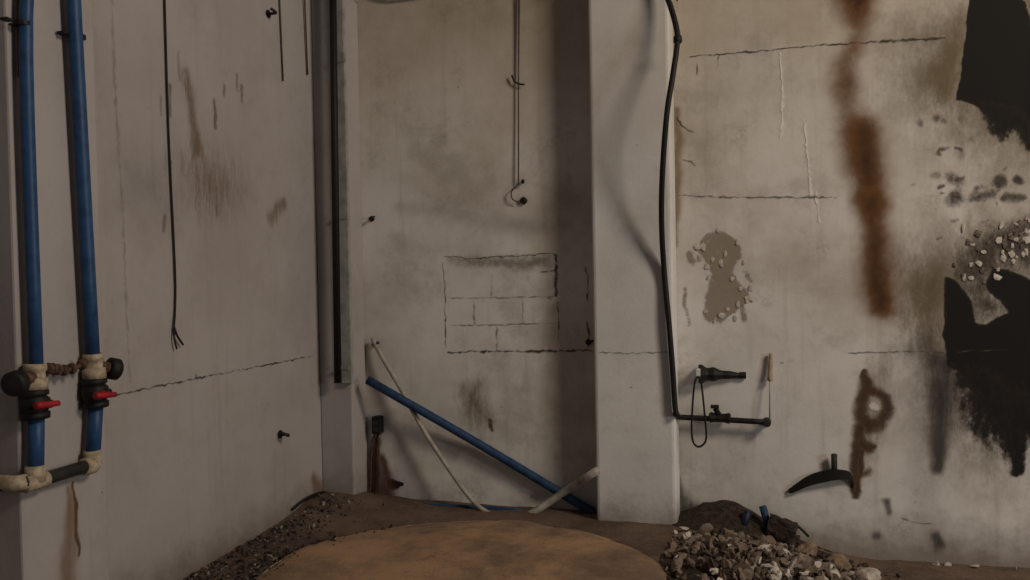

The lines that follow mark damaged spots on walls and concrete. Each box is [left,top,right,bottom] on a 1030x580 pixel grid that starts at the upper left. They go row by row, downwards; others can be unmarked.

corrosion [836,0,894,317]
peeling [687,228,755,323]
peeling [952,217,1030,315]
corrosion [368,436,394,496]
corrosion [64,481,81,580]